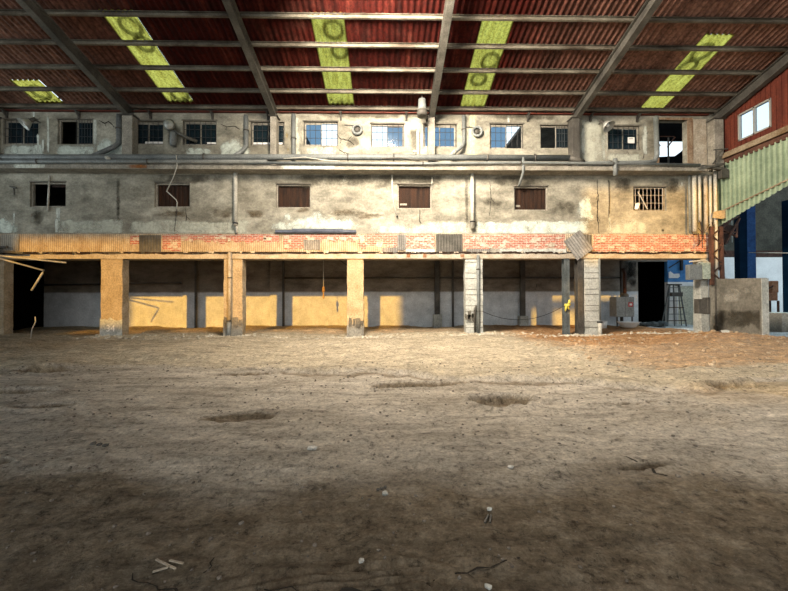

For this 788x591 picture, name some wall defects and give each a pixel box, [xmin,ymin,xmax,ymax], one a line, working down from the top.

flaking render [118,234,566,254]